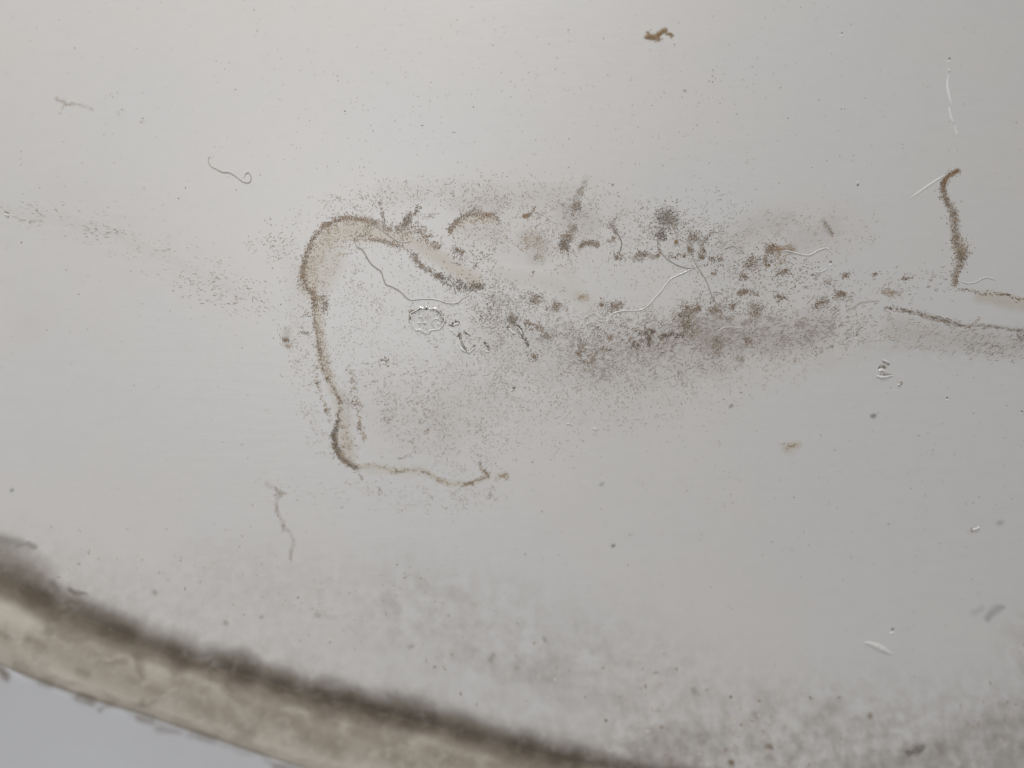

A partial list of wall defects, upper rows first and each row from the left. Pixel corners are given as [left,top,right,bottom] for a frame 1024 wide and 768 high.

leakage [1,64,1024,522]
leakage [0,555,618,768]